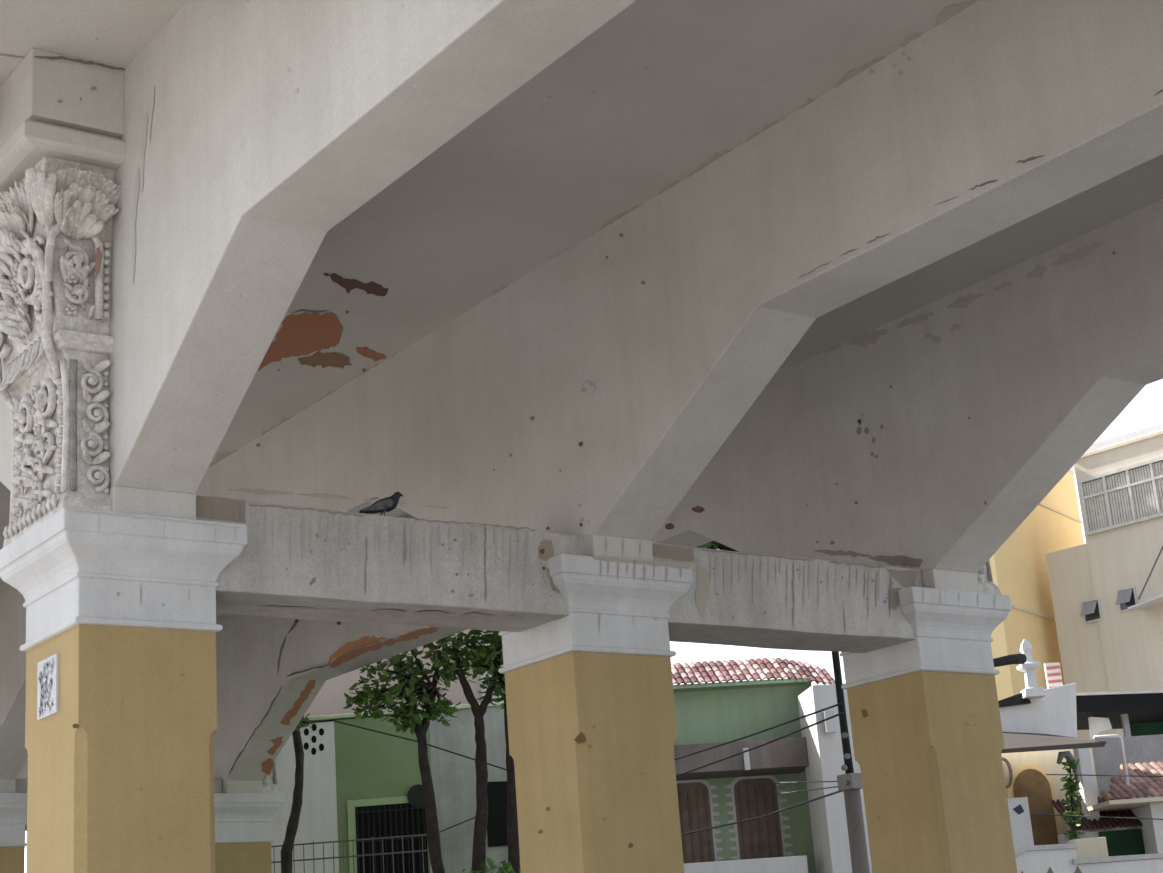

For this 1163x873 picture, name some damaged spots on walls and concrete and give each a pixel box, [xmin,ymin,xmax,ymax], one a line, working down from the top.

crack [0,54,125,70]
peeling [323,273,388,296]
peeling [258,310,394,372]
damp [203,488,379,570]
damp [375,505,535,595]
spalling [327,627,439,668]
crack [228,622,328,776]
spalling [261,680,316,775]